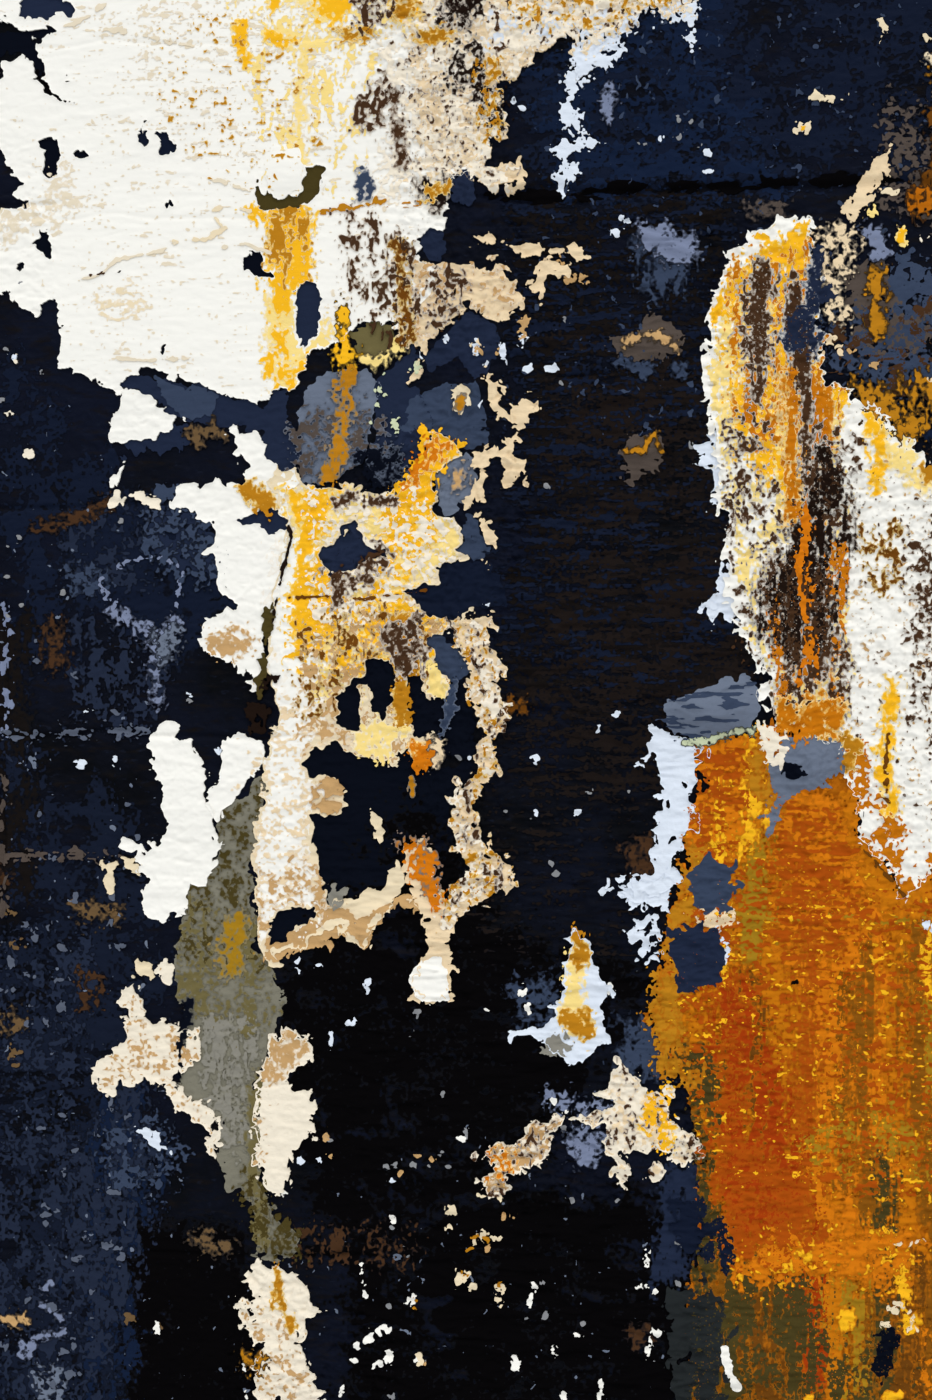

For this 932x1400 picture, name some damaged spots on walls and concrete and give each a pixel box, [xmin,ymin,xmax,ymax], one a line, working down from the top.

peeling [0,0,75,103]
peeling [39,137,89,178]
peeling [138,120,177,155]
spalling [255,165,326,211]
peeling [33,231,52,259]
peeling [243,251,274,278]
peeling [420,228,447,262]
peeling [295,281,322,347]
peeling [120,311,508,1264]
spalling [781,762,808,780]
peeling [666,851,745,993]
spalling [540,1031,575,1057]